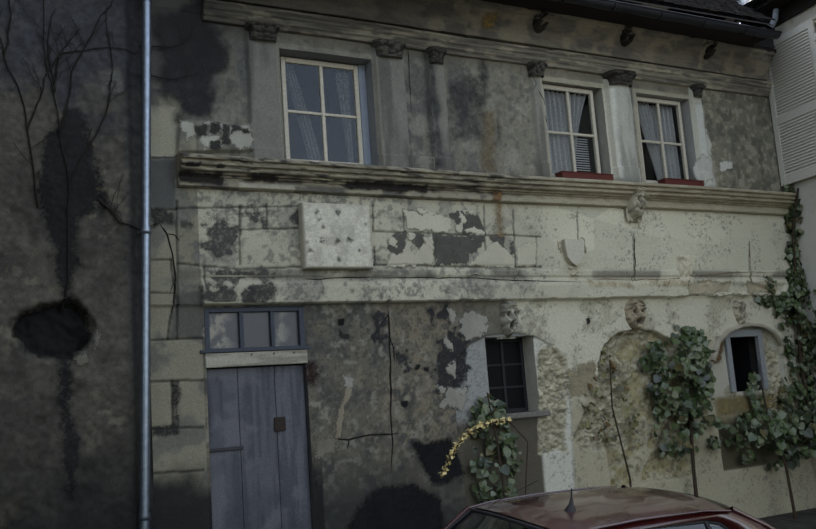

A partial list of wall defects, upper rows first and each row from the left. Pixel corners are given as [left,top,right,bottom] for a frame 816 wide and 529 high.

peeling [179,120,254,152]
peeling [387,208,485,268]
peeling [468,241,537,268]
peeling [447,308,489,341]
crack [336,305,398,476]
peeling [435,337,468,412]